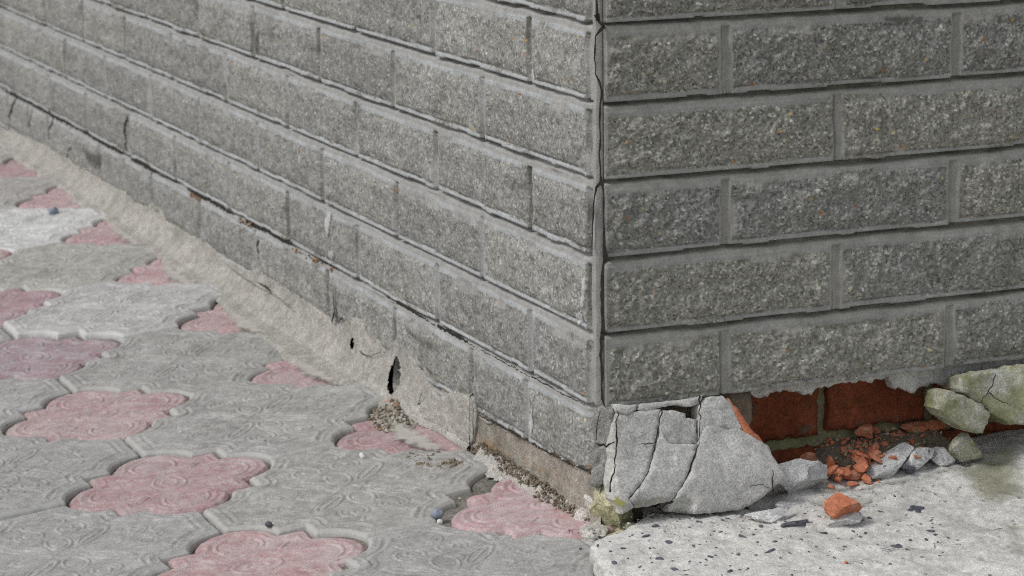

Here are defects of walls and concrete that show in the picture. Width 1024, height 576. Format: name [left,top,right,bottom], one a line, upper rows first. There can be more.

crack [590,0,786,514]
spalling [750,379,1024,464]